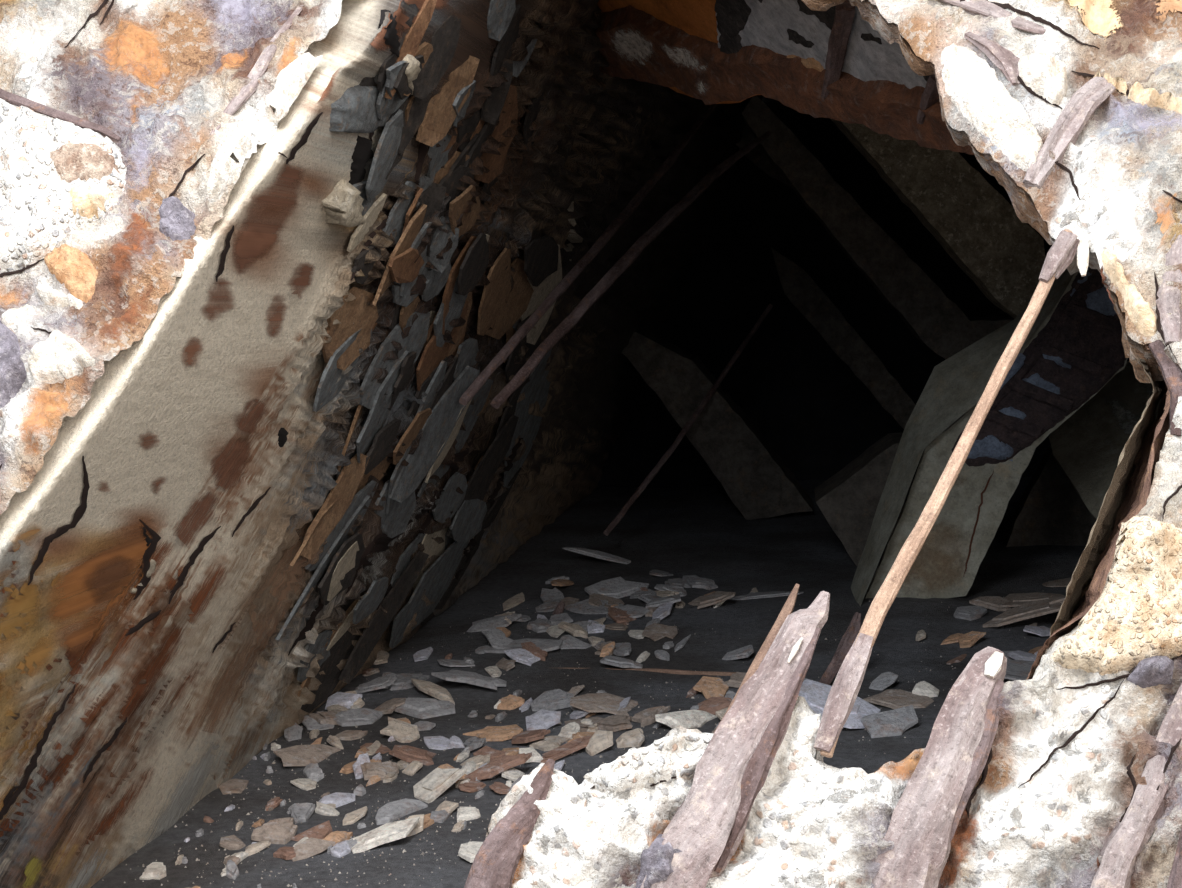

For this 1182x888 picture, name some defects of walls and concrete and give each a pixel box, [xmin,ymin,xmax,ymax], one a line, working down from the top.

peeling [714,0,836,72]
spalling [842,6,1043,171]
spalling [1018,52,1068,107]
rust [204,165,303,319]
rust [268,264,313,336]
spalling [1070,228,1156,336]
crack [1154,272,1177,361]
crack [28,455,90,585]
crack [125,487,271,636]
rust [0,565,227,855]
crack [1018,674,1130,788]
rust [139,862,166,880]